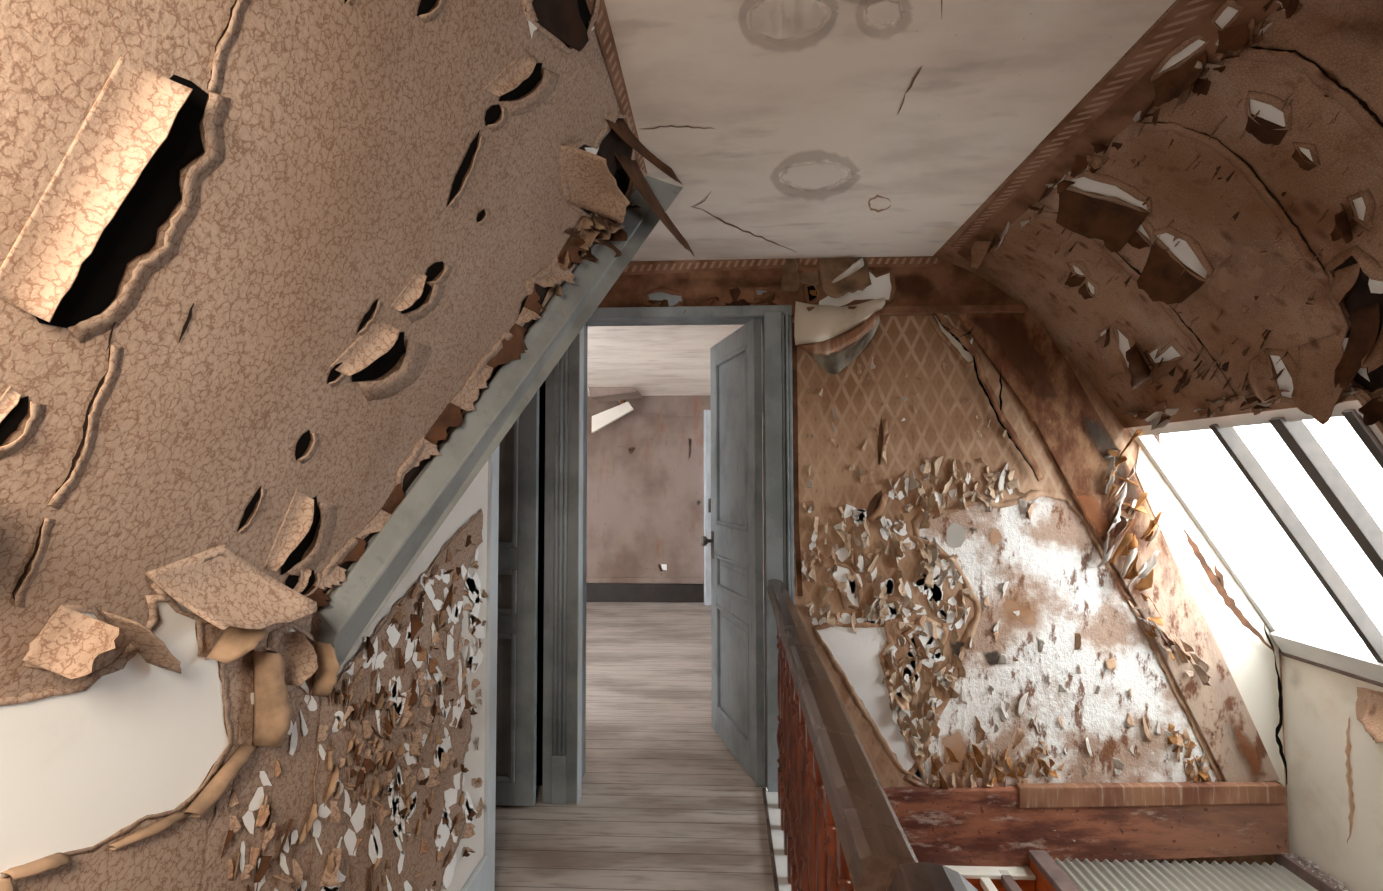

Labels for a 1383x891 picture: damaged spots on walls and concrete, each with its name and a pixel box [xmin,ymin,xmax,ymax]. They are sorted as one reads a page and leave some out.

water stain [866,0,901,24]
peeling [1133,0,1302,136]
water stain [781,163,849,190]
peeling [1151,329,1273,394]
flaking render [801,430,1224,790]
peeling [221,535,488,891]